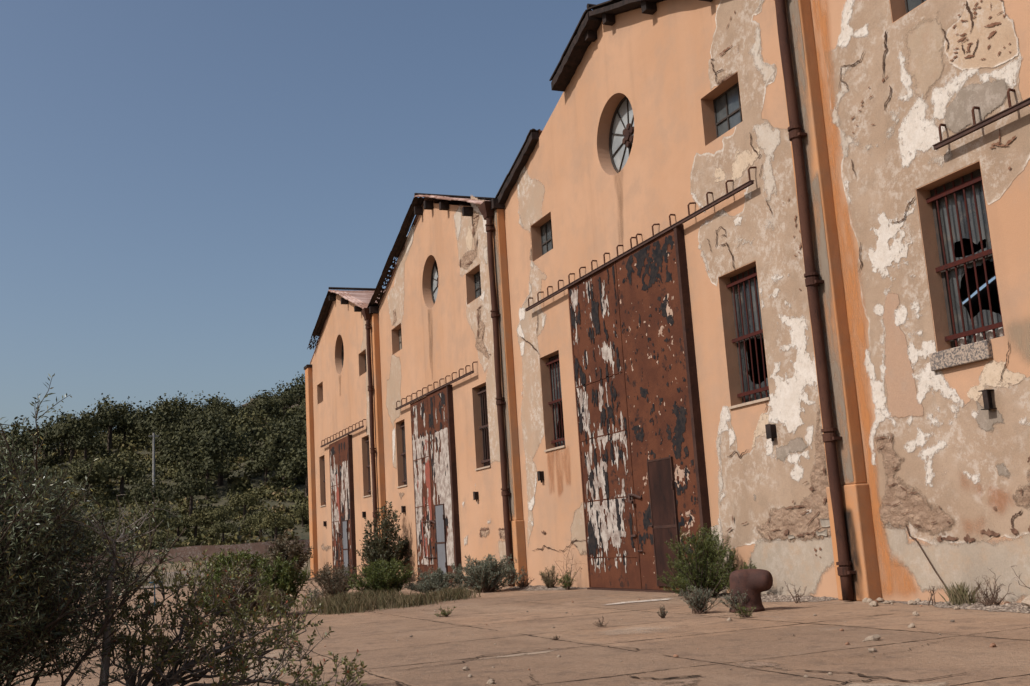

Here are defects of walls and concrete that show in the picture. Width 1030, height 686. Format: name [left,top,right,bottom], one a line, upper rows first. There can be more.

peeling [454,195,500,463]
peeling [516,166,547,543]
peeling [674,464,694,493]
peeling [680,0,834,596]
peeling [824,0,1030,603]
crack [626,672,704,680]
crack [795,635,974,686]